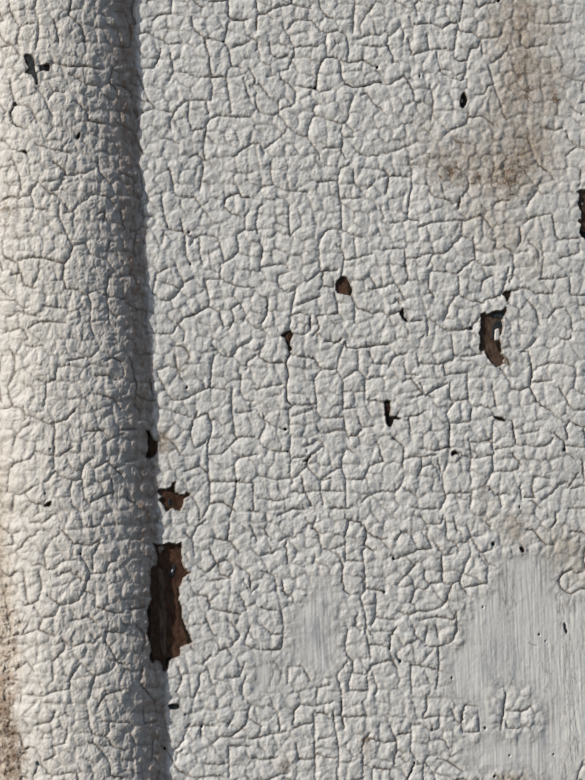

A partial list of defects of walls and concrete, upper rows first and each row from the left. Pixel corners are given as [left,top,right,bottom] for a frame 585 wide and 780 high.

crack [10,0,547,157]
crack [1,162,199,301]
peeling [577,191,585,239]
peeling [336,277,352,296]
peeling [479,291,511,367]
crack [3,358,82,425]
peeling [384,401,400,427]
crack [7,451,91,512]
peeling [157,483,189,511]
crack [136,143,585,780]
peeling [147,543,192,671]
crack [3,660,124,737]